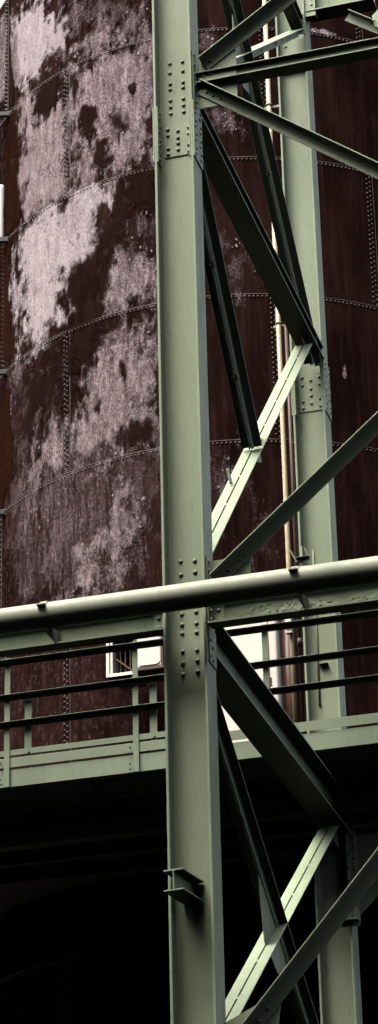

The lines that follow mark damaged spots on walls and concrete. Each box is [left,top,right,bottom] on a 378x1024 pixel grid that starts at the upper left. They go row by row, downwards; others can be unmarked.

peeling [0,0,154,416]
corrosion [0,76,156,510]